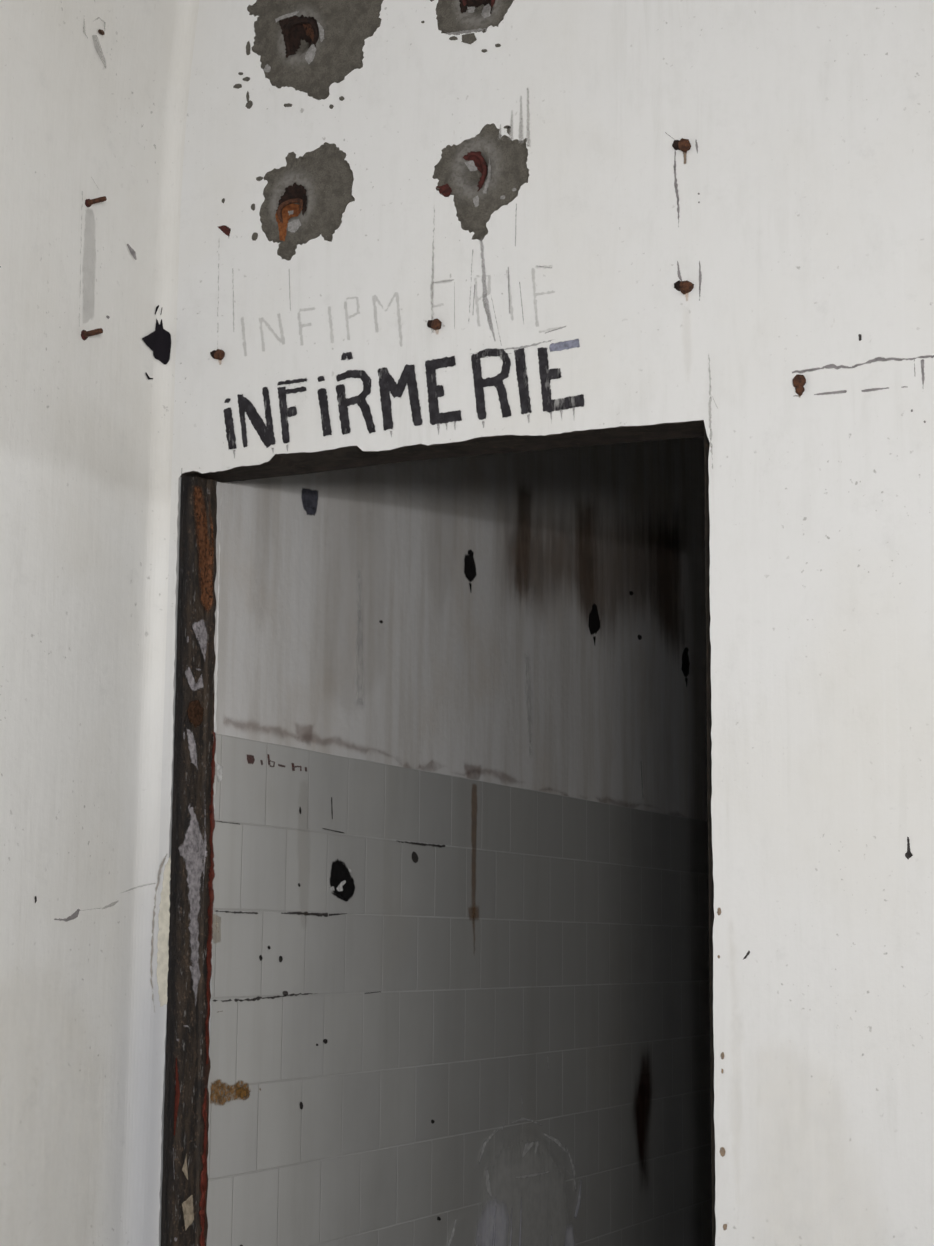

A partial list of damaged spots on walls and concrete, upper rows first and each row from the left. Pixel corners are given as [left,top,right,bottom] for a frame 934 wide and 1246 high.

spalling [233,72,253,109]
spalling [246,0,383,109]
spalling [421,0,514,53]
spalling [251,142,355,261]
spalling [432,123,529,241]
corrosion [194,486,214,611]
corrosion [205,731,221,1064]